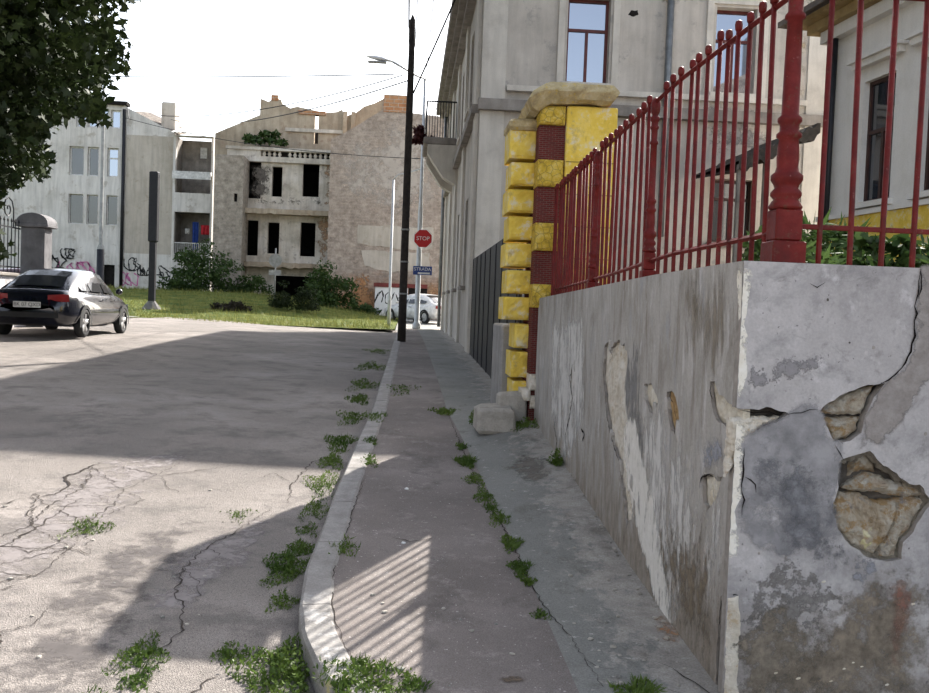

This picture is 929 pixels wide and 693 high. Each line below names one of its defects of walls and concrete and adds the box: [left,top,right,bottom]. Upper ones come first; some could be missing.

crack [878,269,922,386]
flaking render [606,340,635,520]
flaking render [642,384,680,445]
crack [741,408,816,416]
spalling [820,266,929,560]
water stain [756,461,844,558]
water stain [733,558,929,693]